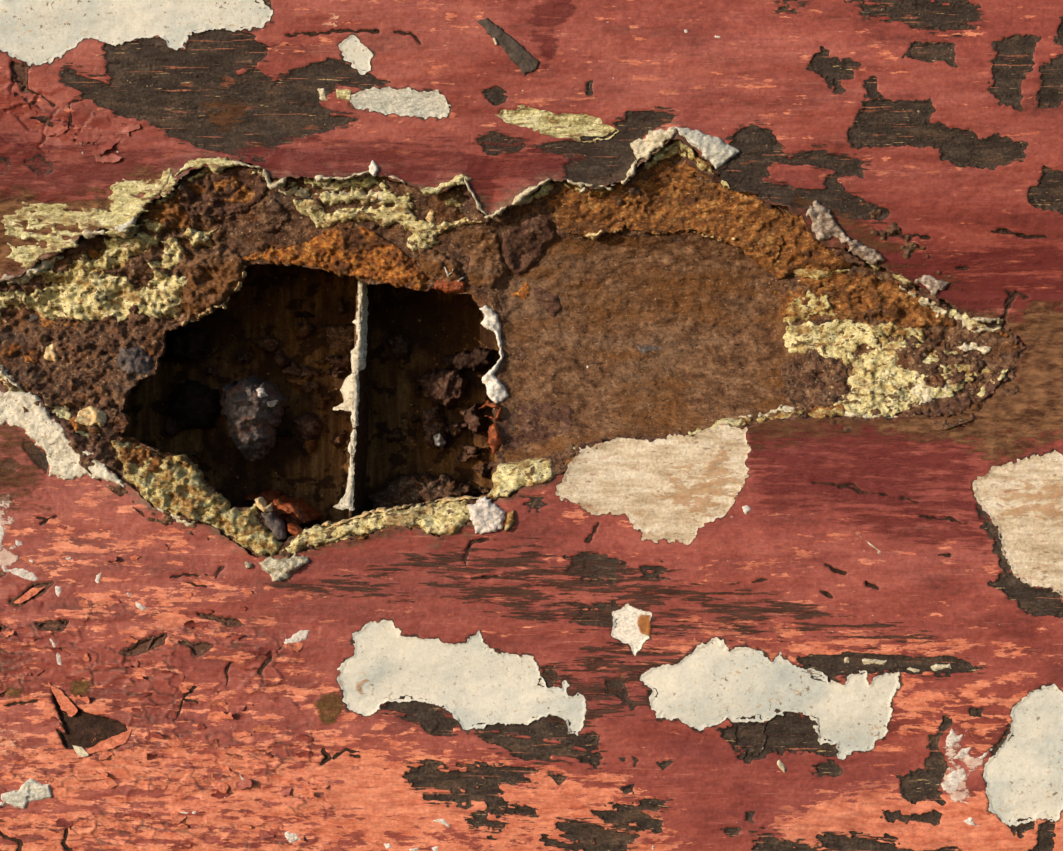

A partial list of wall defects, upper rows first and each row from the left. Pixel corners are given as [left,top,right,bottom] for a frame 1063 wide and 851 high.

crack [14,89,84,133]
peeling [0,0,451,176]
peeling [717,46,1029,228]
peeling [520,422,751,545]
crack [3,699,38,707]
crack [174,686,198,720]
crack [320,748,360,765]
peeling [337,620,639,840]
peeling [640,637,987,777]
peeling [720,684,1063,851]
crack [0,831,23,851]
crack [61,826,72,851]